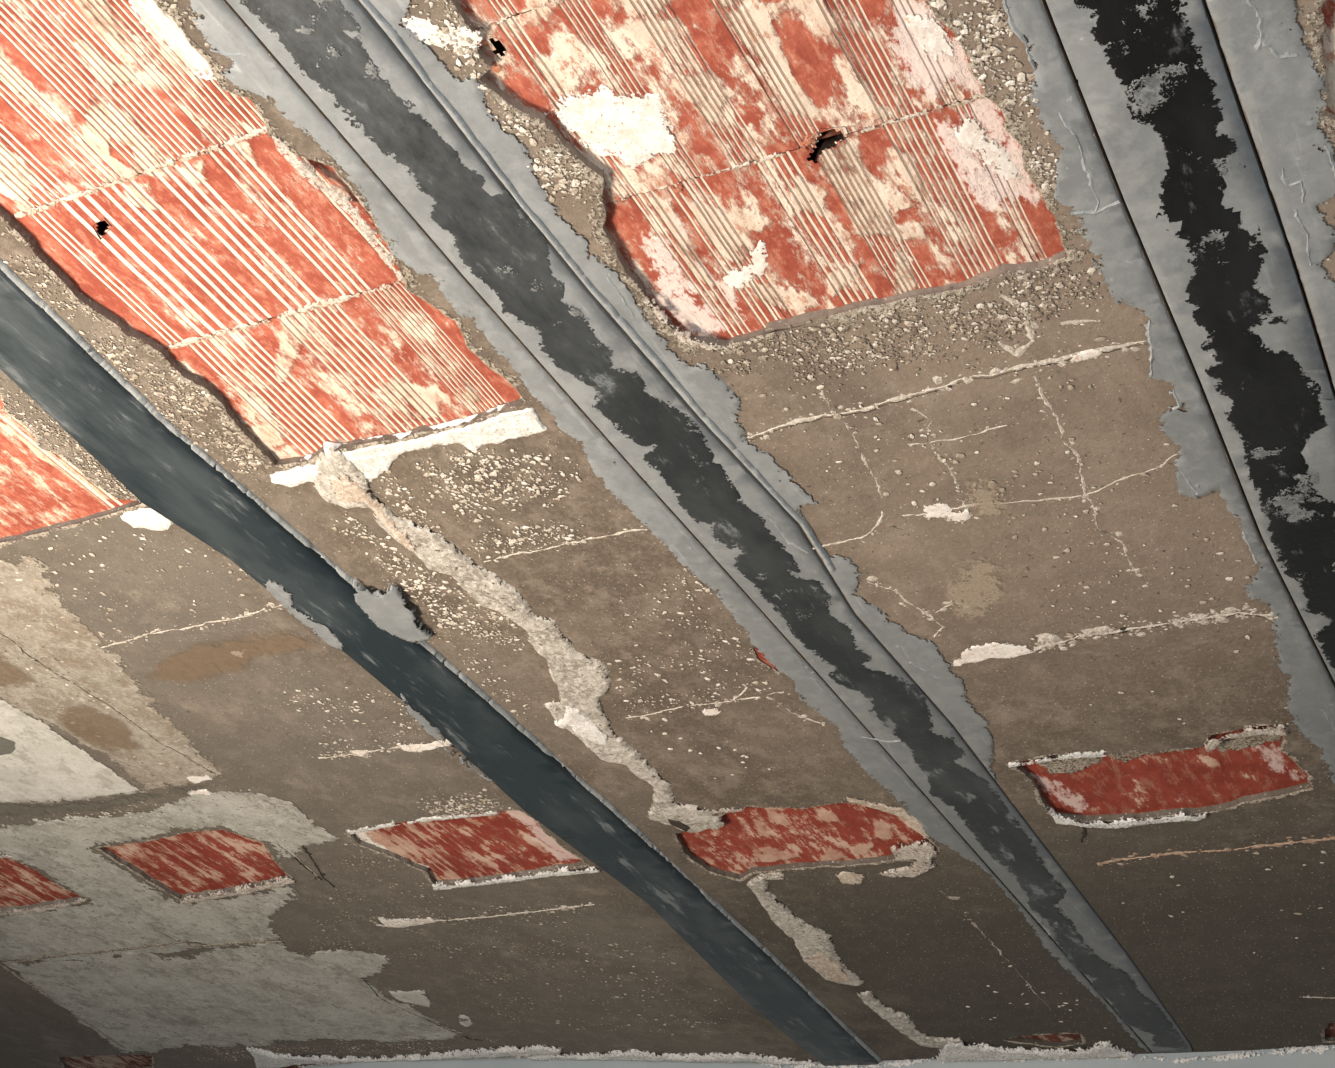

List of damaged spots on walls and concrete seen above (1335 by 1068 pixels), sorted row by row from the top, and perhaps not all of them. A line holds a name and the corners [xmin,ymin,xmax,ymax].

spalling [1074,0,1335,669]
crack [742,294,1178,588]
spalling [240,0,1190,1049]
crack [866,576,1279,666]
flaking render [1005,724,1315,829]
flaking render [0,852,88,916]
flaking render [95,829,296,904]
peeling [246,1032,1134,1068]
peeling [1140,1022,1335,1064]